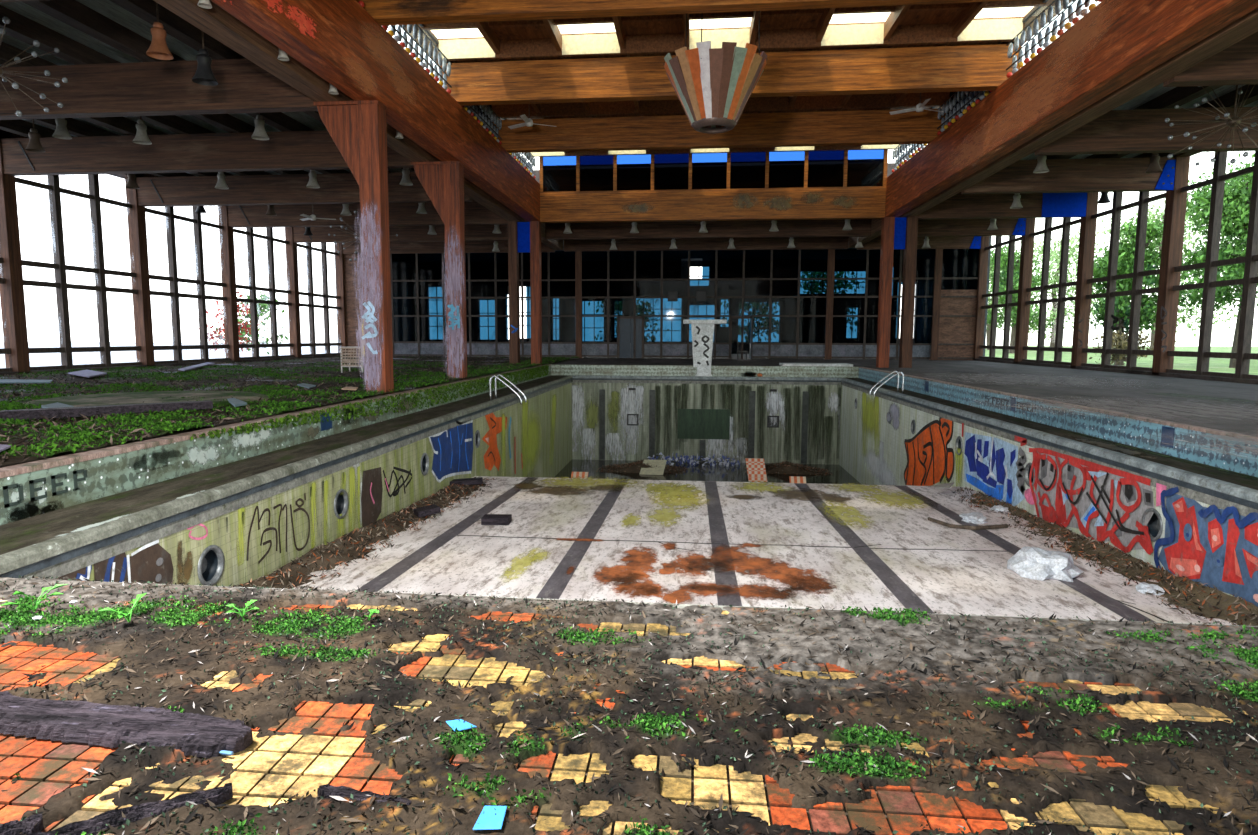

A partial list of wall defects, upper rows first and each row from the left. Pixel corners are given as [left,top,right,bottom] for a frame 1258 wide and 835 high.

peeling [355,207,383,390]
peeling [442,234,465,378]
leakage [502,394,618,495]
leakage [572,384,841,463]
corrosion [593,543,832,604]